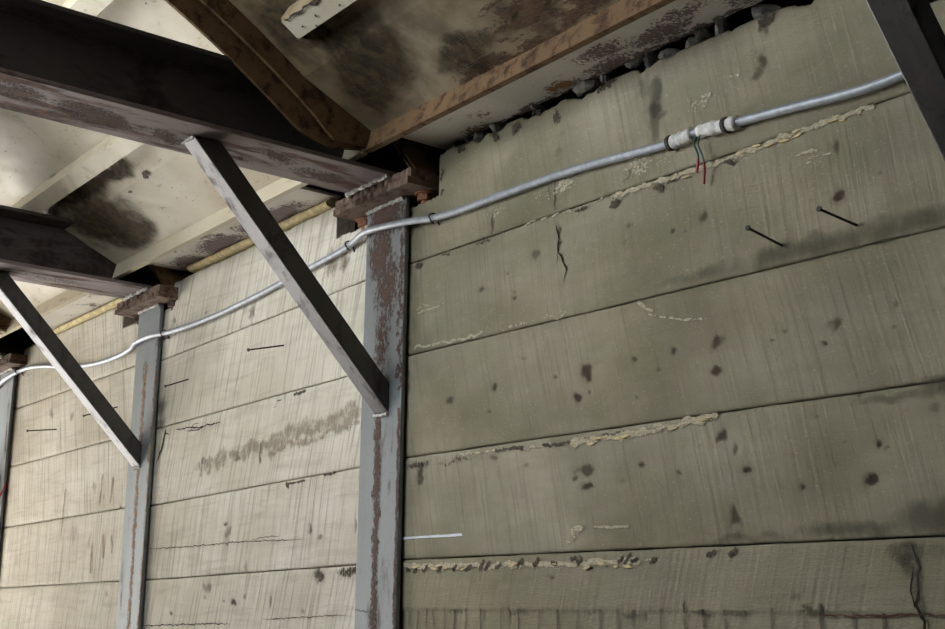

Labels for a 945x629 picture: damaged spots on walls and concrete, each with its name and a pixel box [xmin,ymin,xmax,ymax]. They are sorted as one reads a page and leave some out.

leakage [56,159,156,248]
crack [553,184,567,282]
corrosion [367,202,407,390]
corrosion [368,417,381,629]
crack [817,544,945,629]